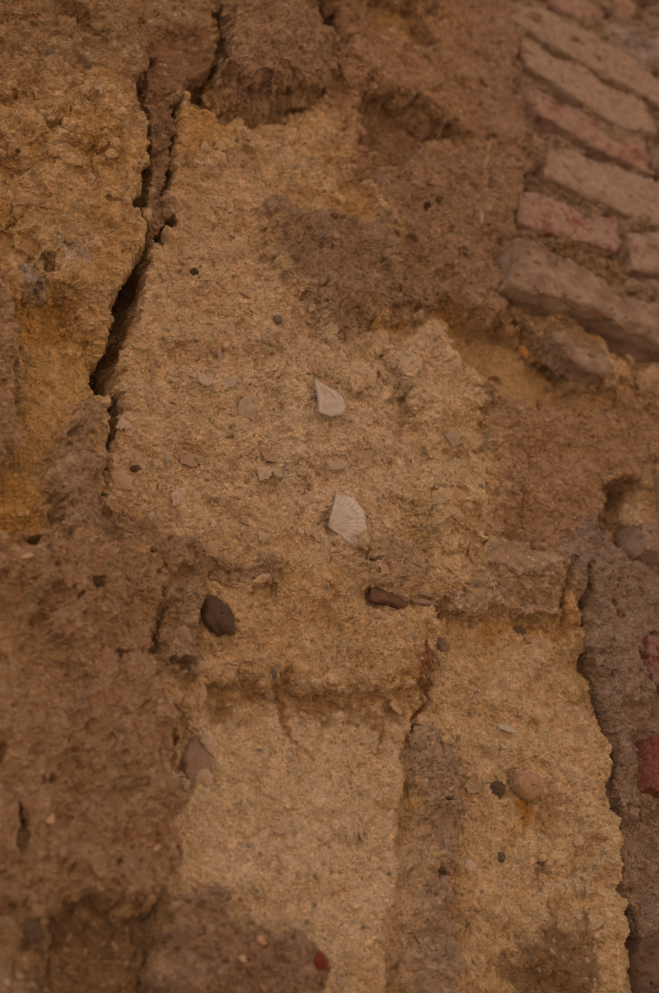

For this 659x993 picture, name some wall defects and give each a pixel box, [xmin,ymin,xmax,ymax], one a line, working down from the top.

crack [87,1,239,497]
crack [558,552,642,941]